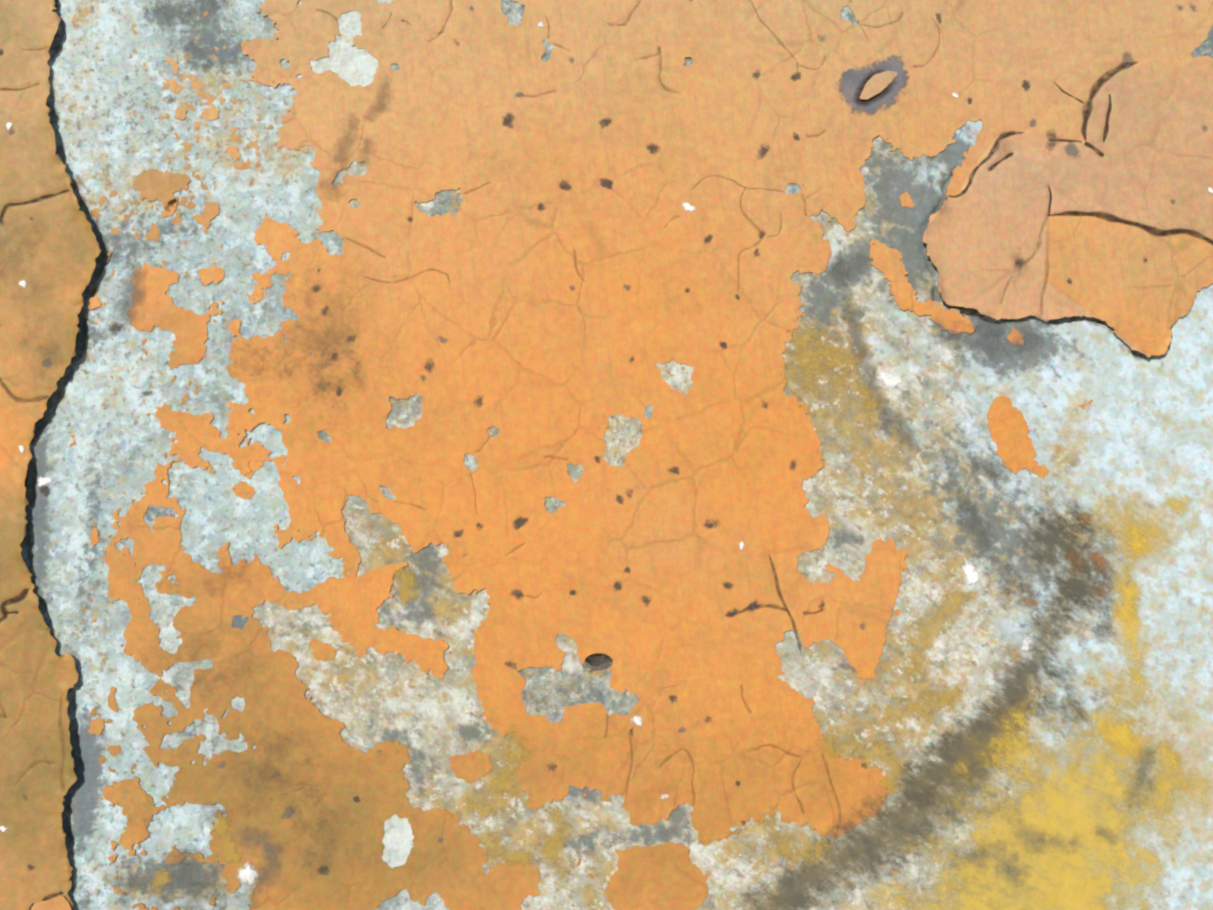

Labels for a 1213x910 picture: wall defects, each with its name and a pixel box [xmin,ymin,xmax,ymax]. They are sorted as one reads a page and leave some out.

peeling [310,11,379,87]
peeling [501,0,525,27]
peeling [541,38,554,62]
peeling [1191,25,1213,58]
crack [947,62,1138,197]
crack [0,189,69,221]
crack [1047,186,1213,244]
peeling [21,0,349,910]
peeling [232,119,1213,910]
crack [0,588,29,622]
crack [728,556,823,647]
water stain [748,506,1114,910]